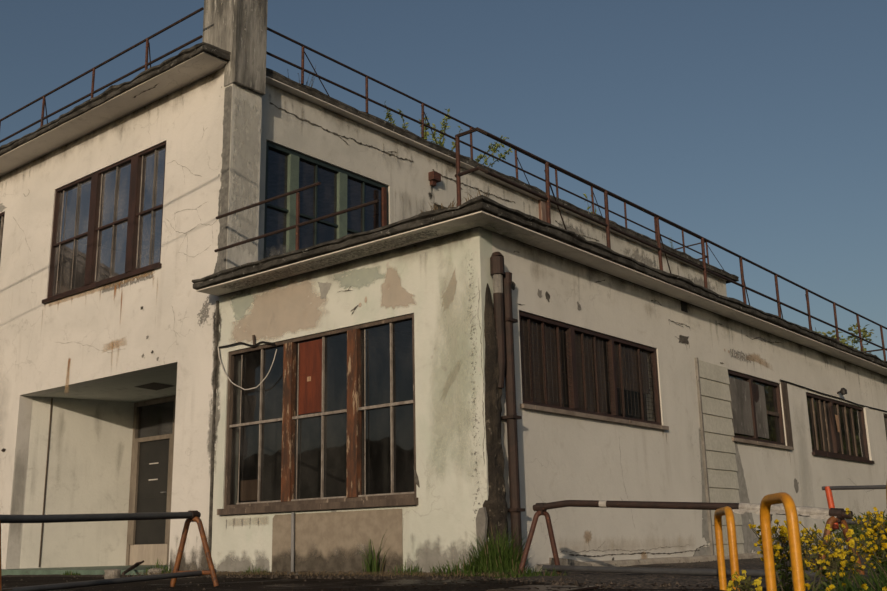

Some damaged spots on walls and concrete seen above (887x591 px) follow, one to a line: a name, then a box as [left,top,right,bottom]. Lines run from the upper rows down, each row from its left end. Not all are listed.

crack [235,72,516,204]
peeling [197,229,441,342]
peeling [442,271,456,309]